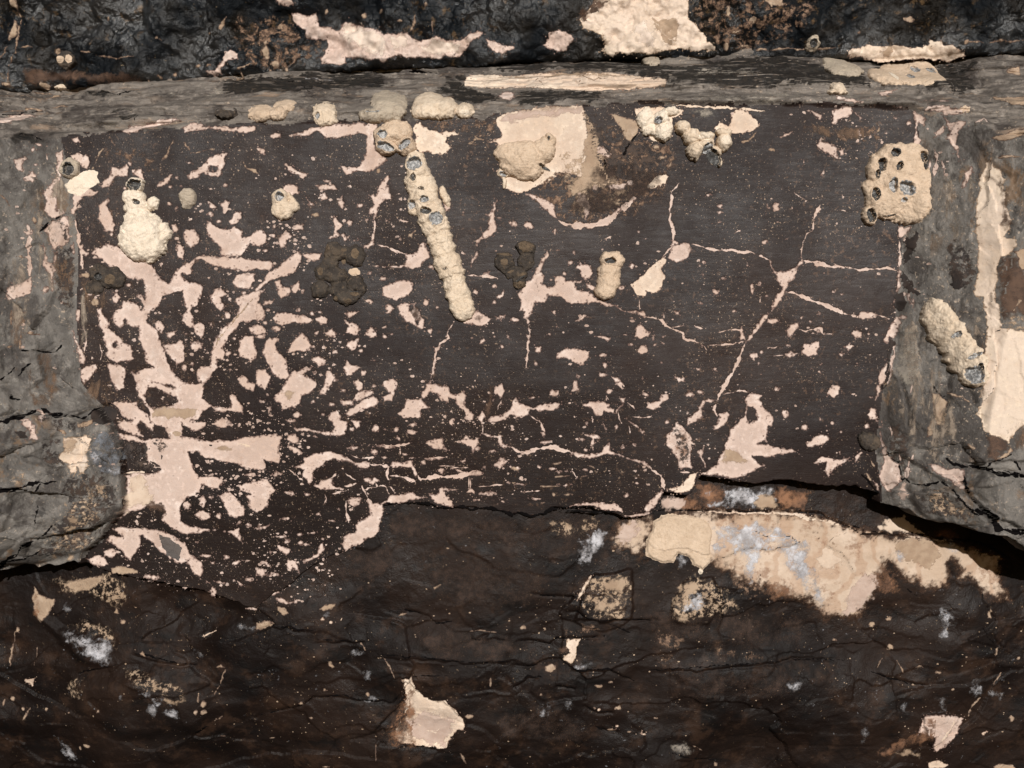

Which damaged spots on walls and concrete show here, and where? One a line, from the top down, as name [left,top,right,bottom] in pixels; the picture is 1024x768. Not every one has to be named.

crack [0,345,111,424]
crack [429,321,455,384]
peeling [0,0,931,630]
crack [614,183,898,417]
peeling [790,89,1024,461]
crack [480,431,768,513]
peeling [926,460,968,490]
water stain [712,522,821,600]
efflorescence [66,621,114,661]
water stain [658,630,684,662]
peeling [375,655,474,763]
peeling [881,697,981,768]